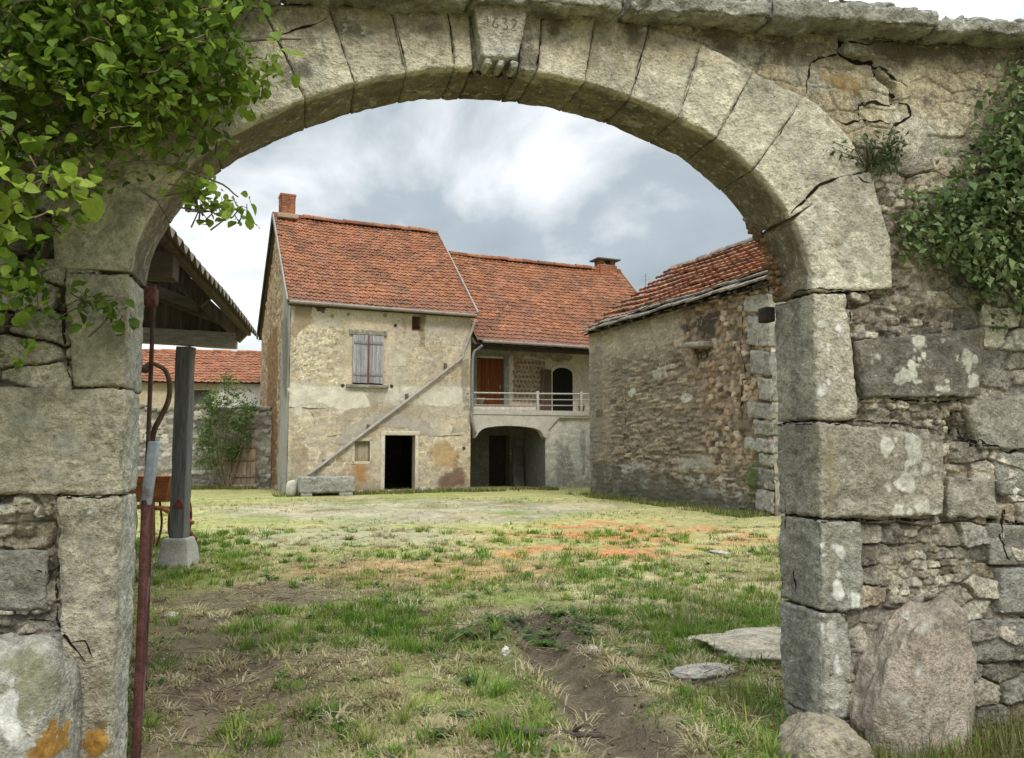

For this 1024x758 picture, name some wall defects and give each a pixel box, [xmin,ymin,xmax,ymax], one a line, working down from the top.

crack [806,39,928,136]
crack [773,172,873,224]
crack [29,565,92,662]